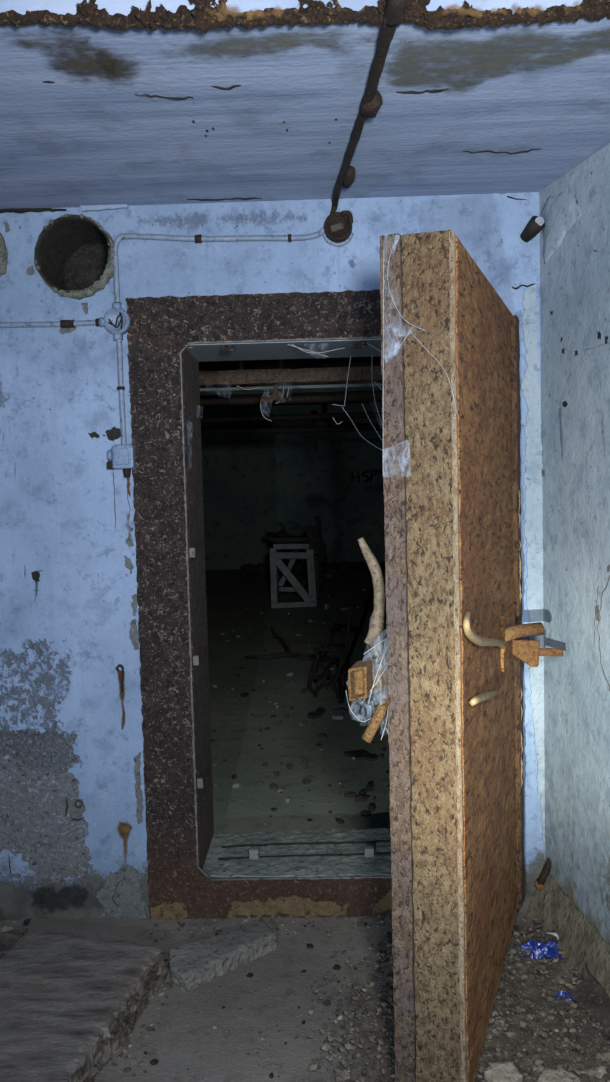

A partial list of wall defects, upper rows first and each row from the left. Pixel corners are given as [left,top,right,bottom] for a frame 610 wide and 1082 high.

rust [0,0,388,33]
rust [397,0,610,30]
leakage [17,32,135,81]
leakage [388,30,610,90]
peeling [124,514,134,574]
peeling [129,594,139,650]
spalling [0,638,93,884]
peeling [133,752,144,824]
rust [118,822,132,861]
leakage [33,886,88,913]
spalling [96,864,148,918]